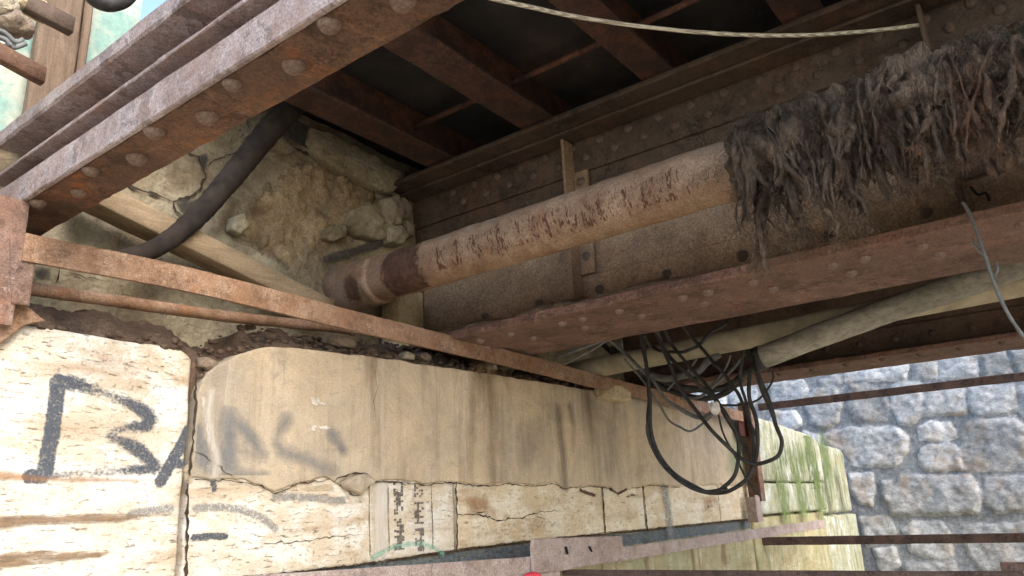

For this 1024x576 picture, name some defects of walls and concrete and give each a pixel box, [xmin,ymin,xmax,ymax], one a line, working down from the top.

crack [130,153,234,216]
spalling [307,472,376,496]
crack [260,481,748,575]
water stain [776,433,844,521]